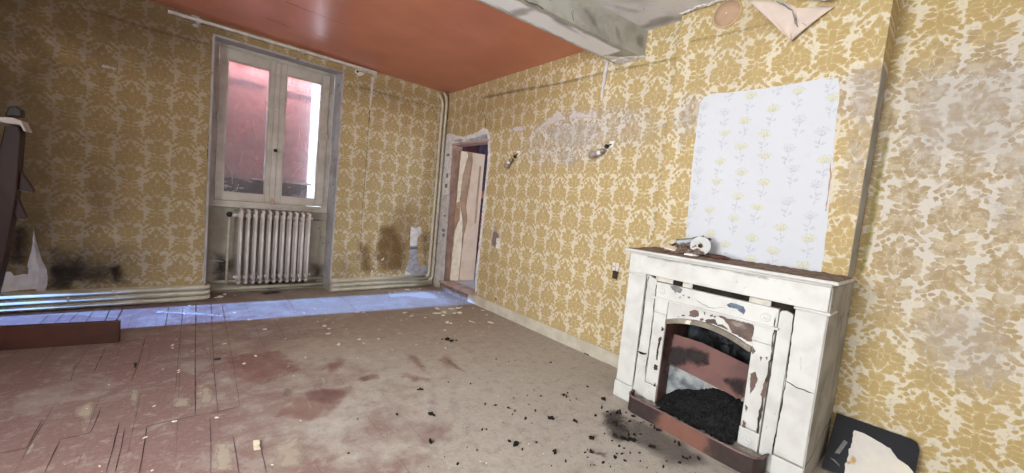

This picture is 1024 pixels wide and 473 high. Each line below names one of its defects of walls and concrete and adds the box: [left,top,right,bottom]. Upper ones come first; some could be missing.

flaking render [393,128,491,292]
water stain [380,229,402,268]
water stain [52,262,119,287]